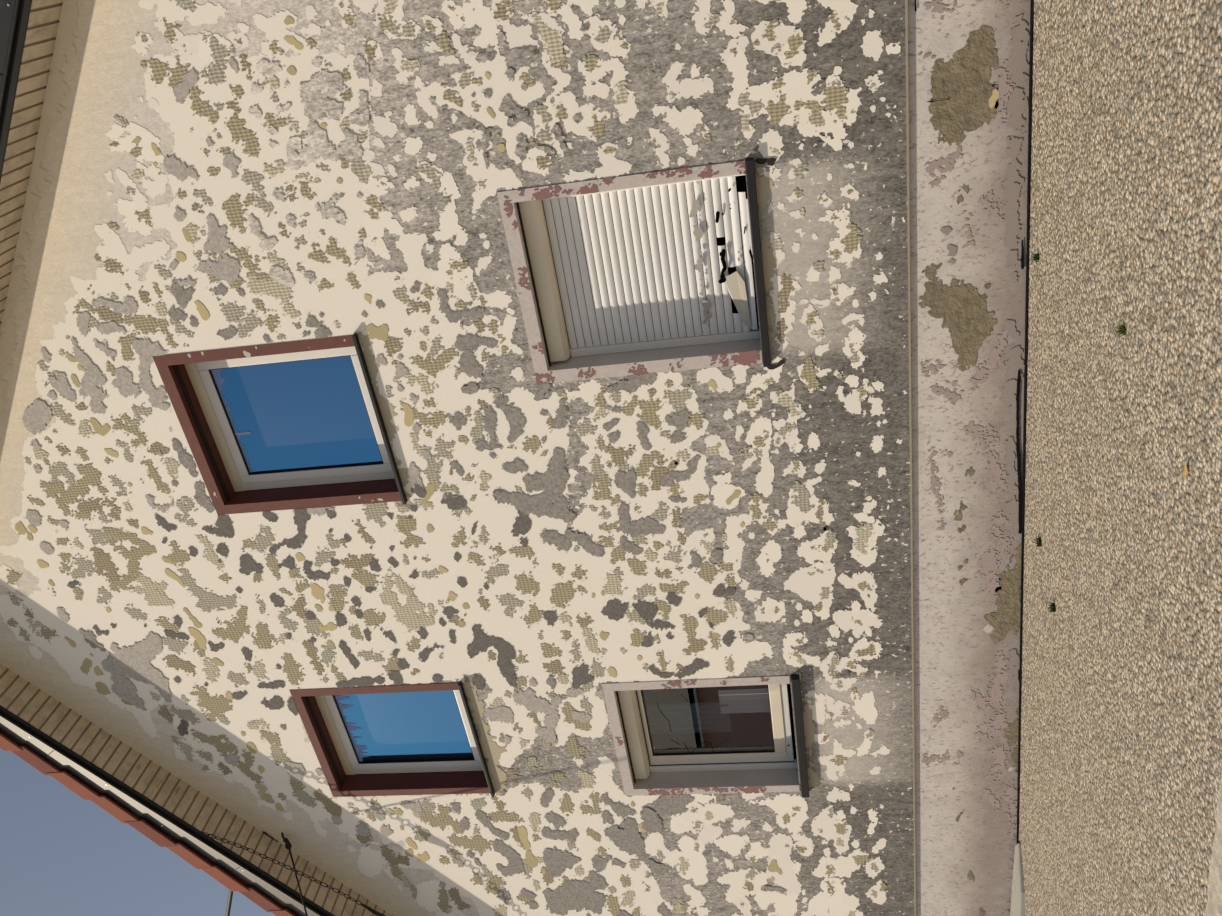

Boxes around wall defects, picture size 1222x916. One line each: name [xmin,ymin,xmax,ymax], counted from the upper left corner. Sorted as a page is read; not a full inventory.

spalling [928,26,999,146]
spalling [918,263,997,371]
peeling [0,0,903,916]